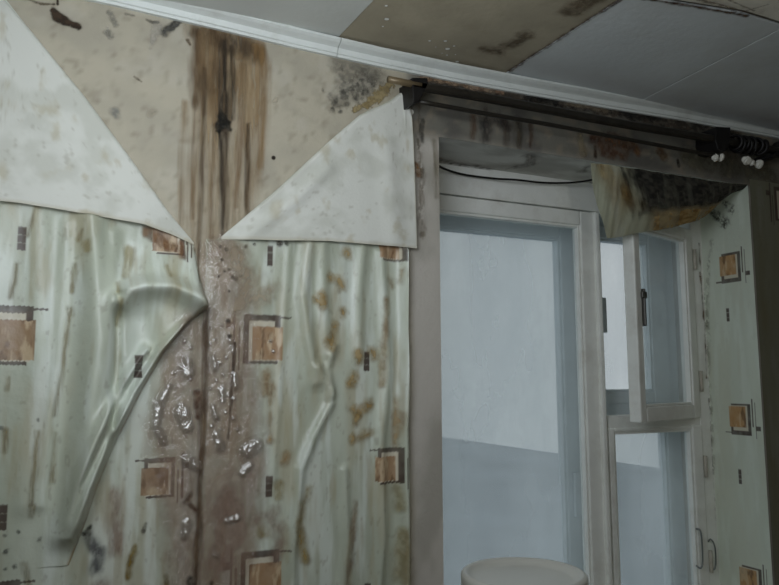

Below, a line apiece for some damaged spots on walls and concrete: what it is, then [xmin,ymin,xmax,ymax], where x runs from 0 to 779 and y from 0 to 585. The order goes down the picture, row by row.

spalling [50,0,81,30]
water stain [151,21,181,40]
water stain [186,28,265,231]